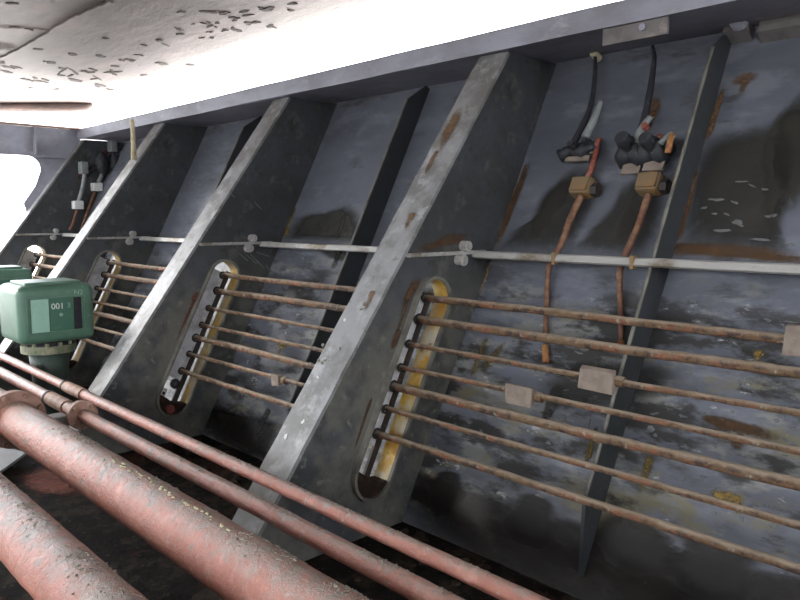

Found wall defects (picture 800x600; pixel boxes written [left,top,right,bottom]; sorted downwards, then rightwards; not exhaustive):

peeling [191,6,277,39]
peeling [0,39,170,91]
corrosion [733,73,754,92]
corrosion [425,110,460,172]
corrosion [496,165,527,242]
peeling [700,198,744,232]
corrosion [673,172,800,262]
corrosion [391,281,420,348]
corrosion [703,415,769,449]
damp [511,494,553,541]
damp [599,516,754,596]